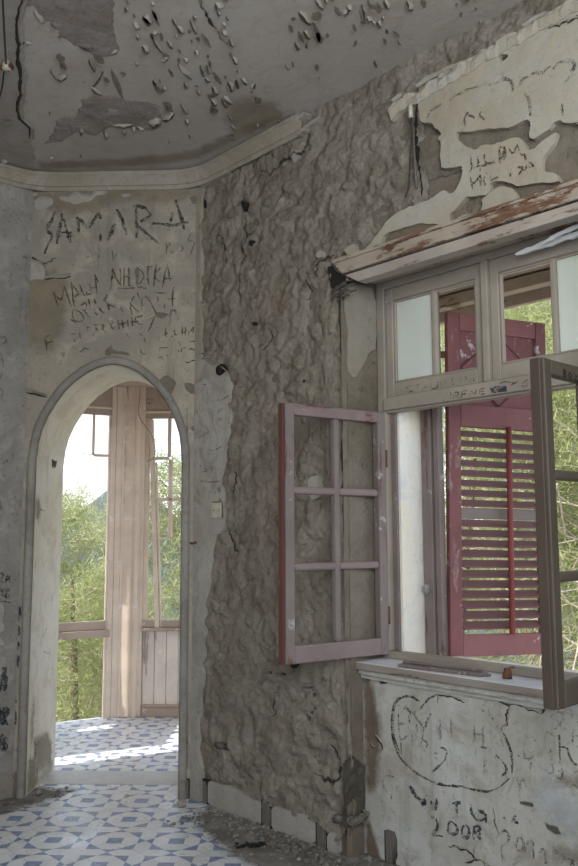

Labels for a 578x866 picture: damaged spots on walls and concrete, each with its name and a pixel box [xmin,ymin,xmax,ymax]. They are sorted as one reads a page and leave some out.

peeling [0,0,261,171]
crack [262,134,310,175]
flaking render [190,0,578,846]
crack [314,743,342,785]
crack [450,845,491,866]